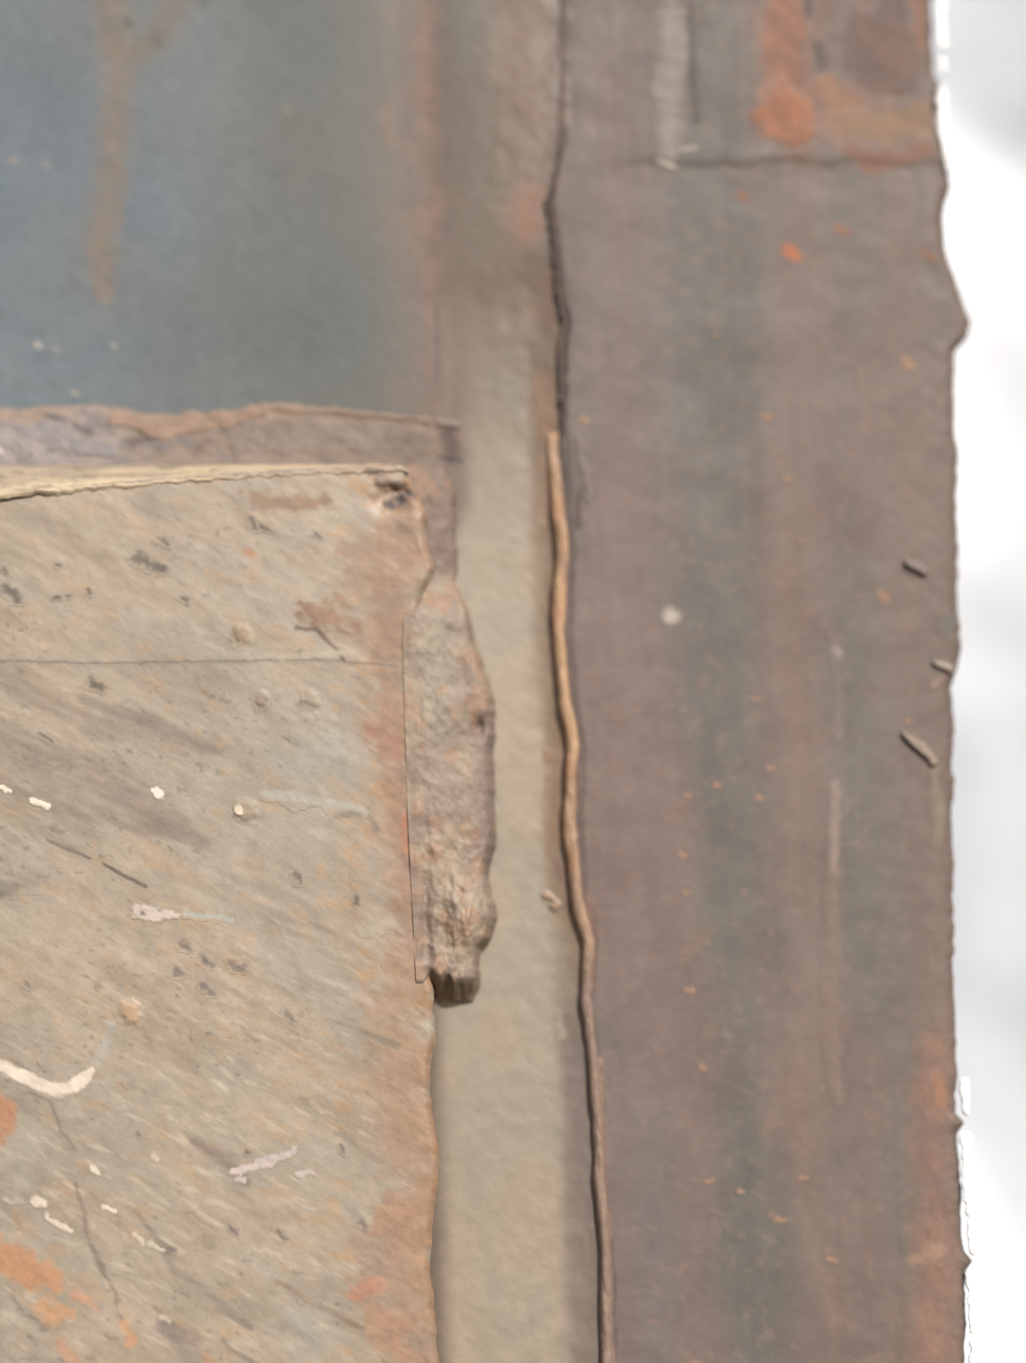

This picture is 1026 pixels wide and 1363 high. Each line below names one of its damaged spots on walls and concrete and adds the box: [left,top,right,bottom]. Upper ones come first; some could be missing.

corrosion [732,0,944,184]
crack [545,124,601,999]